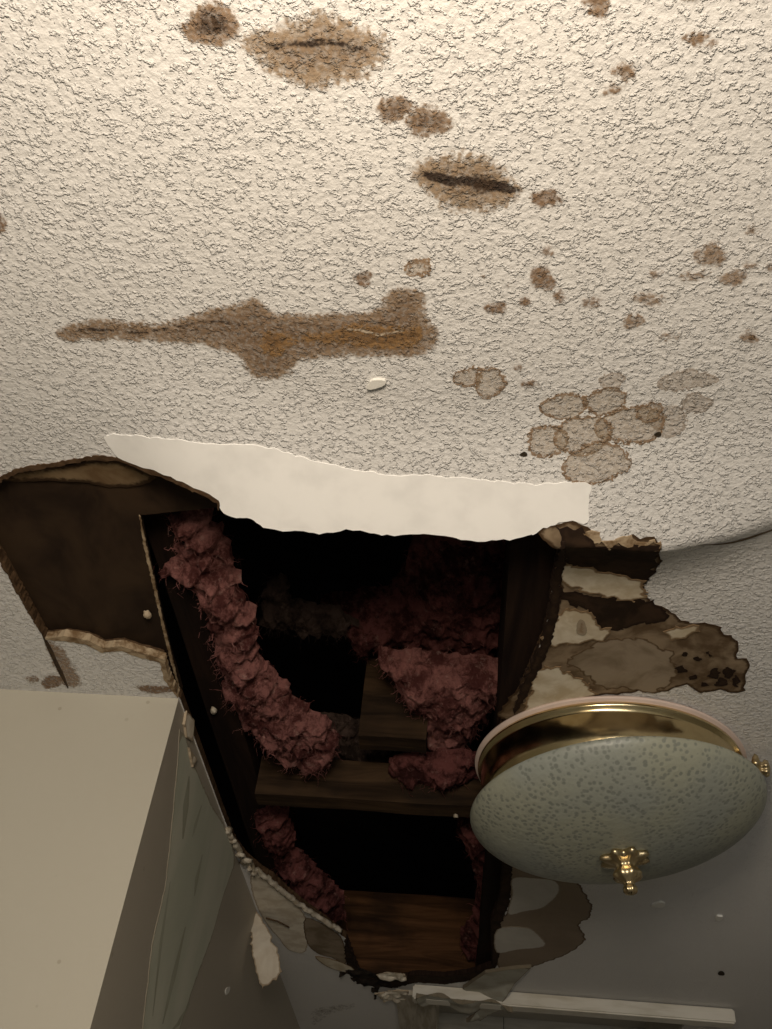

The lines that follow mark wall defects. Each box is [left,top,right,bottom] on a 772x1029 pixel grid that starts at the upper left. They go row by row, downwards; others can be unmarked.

leakage [181,0,389,90]
leakage [377,95,452,137]
leakage [413,153,562,213]
leakage [530,248,563,303]
leakage [453,365,521,399]
leakage [526,387,667,485]
peeling [555,564,648,603]
peeling [540,607,612,647]
peeling [663,624,700,641]
peeling [522,665,599,712]
peeling [142,711,354,1029]
peeling [463,867,592,1002]